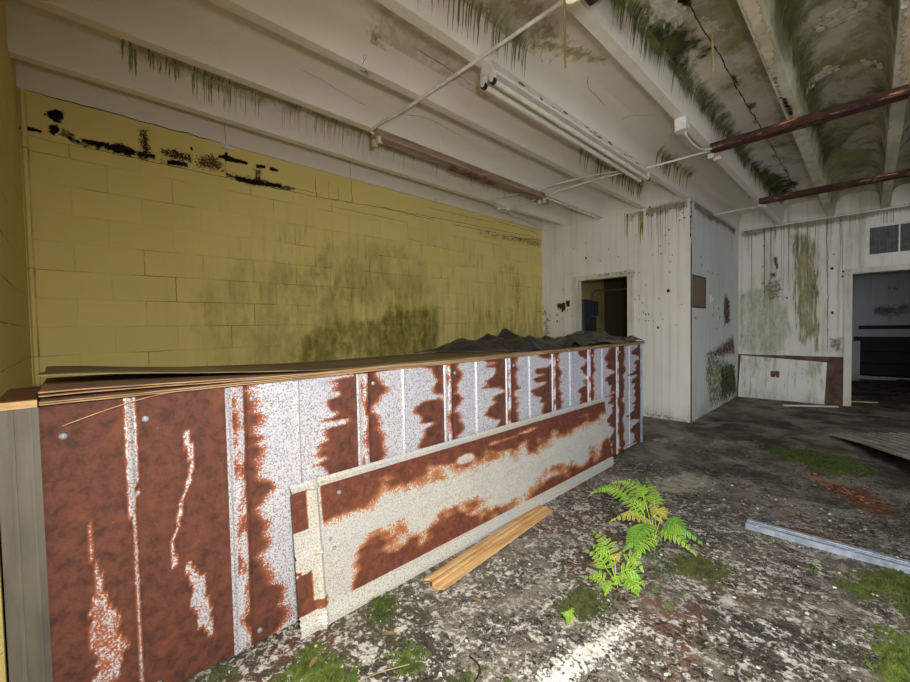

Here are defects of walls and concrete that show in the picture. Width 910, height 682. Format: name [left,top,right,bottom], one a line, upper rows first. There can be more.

damp [121,39,137,75]
damp [148,49,264,113]
damp [431,0,556,75]
damp [611,0,740,140]
crack [690,5,802,199]
damp [771,0,842,113]
damp [19,109,294,190]
damp [580,150,643,198]
damp [656,149,692,188]
damp [734,144,773,196]
damp [624,201,910,299]